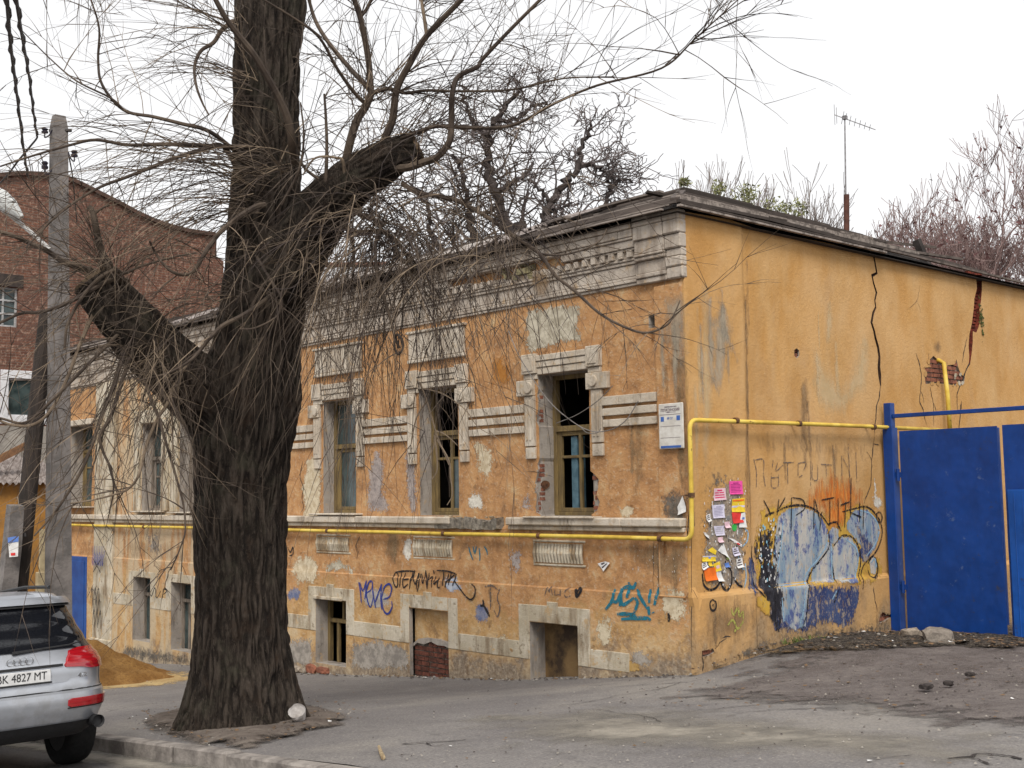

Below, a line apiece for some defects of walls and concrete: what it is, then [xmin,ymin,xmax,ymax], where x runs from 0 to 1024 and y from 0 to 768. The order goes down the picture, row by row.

peeling [521,299,581,355]
leakage [700,299,729,412]
flaking render [924,357,964,387]
crack [916,271,985,426]
crack [864,385,881,503]
peeling [367,451,389,516]
peeling [467,441,498,512]
flaking render [514,461,554,515]
flaking render [592,474,600,512]
peeling [291,552,354,590]
peeling [655,585,689,625]